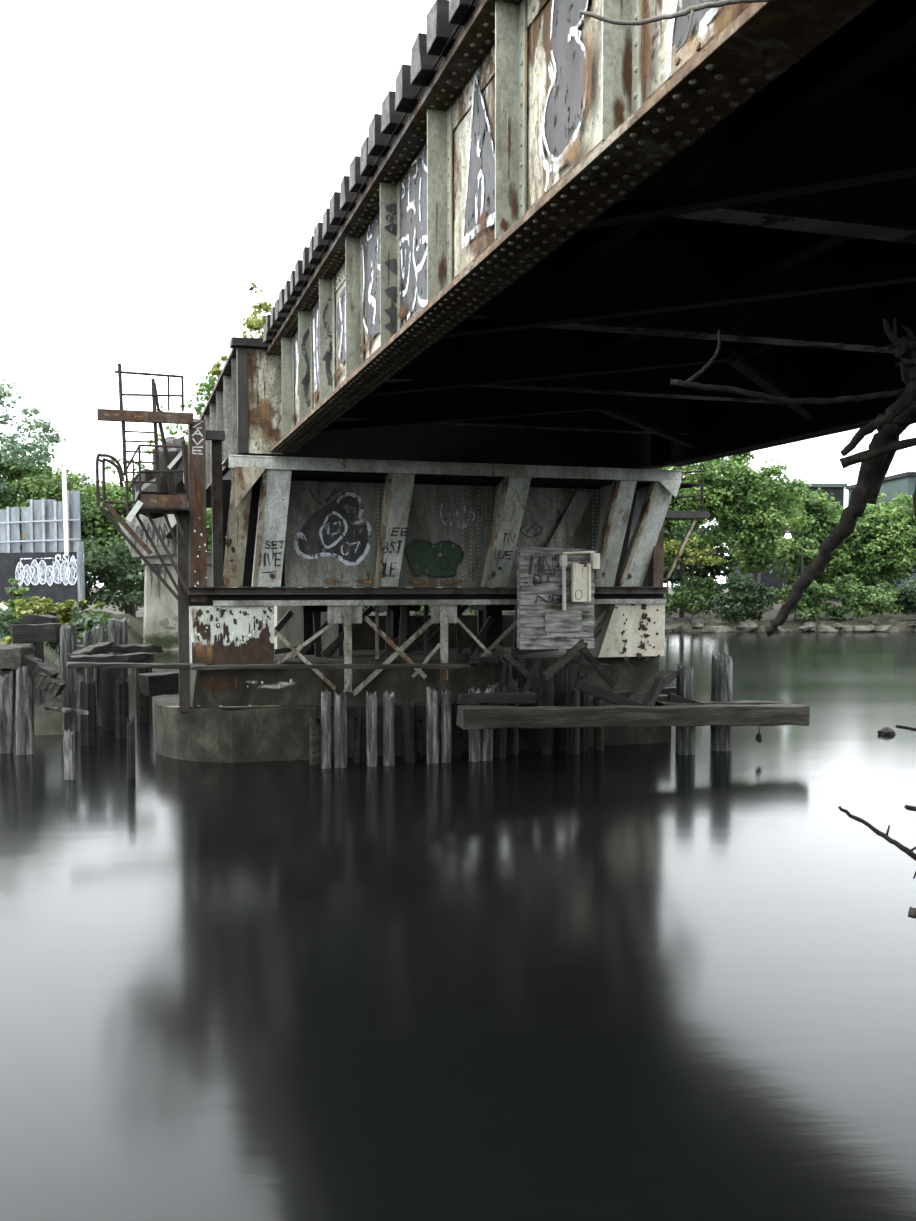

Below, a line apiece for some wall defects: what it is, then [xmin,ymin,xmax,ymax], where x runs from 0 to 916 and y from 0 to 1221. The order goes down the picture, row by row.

corrosion [675,0,751,69]
corrosion [579,27,593,119]
corrosion [559,139,579,165]
corrosion [468,189,518,256]
corrosion [248,360,270,440]
peeling [192,606,274,665]